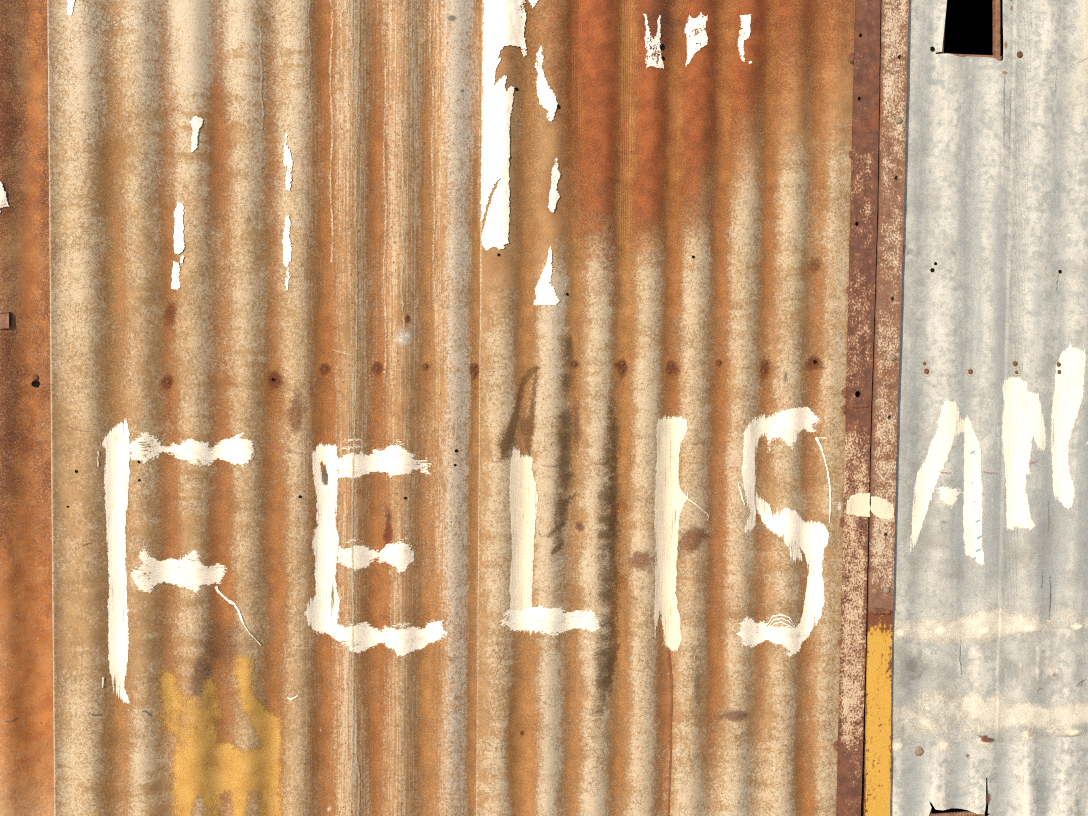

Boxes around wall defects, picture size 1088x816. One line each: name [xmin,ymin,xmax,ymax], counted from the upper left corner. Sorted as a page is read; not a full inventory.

rust [157,3,181,560]
rust [195,458,236,764]
rust [206,0,233,445]
rust [258,0,338,788]
rust [361,471,392,816]
rust [366,5,389,454]
rust [465,158,481,816]
water stain [499,366,538,460]
rust [504,632,542,816]
water stain [548,410,583,554]
water stain [592,405,619,715]
rust [513,0,854,816]